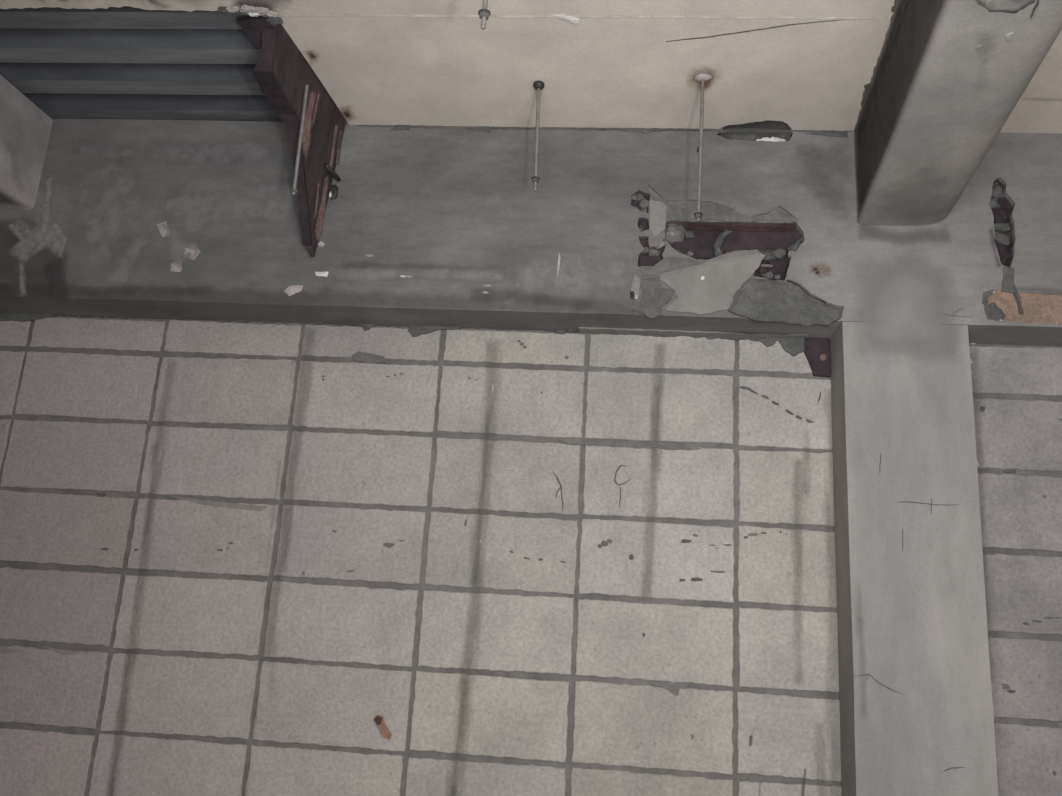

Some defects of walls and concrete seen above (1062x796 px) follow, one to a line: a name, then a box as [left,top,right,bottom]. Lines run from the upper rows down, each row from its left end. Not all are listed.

spalling [718,120,792,142]
spalling [630,184,844,327]
spalling [982,180,1062,324]